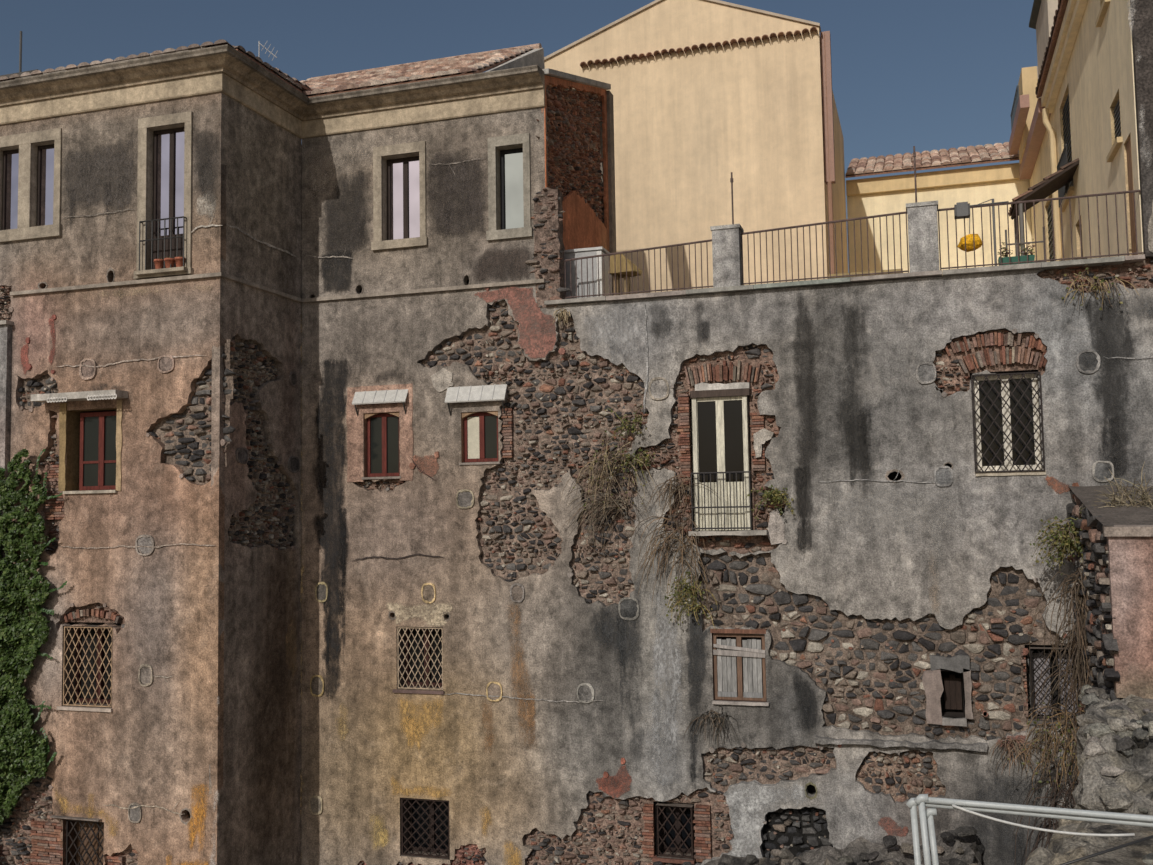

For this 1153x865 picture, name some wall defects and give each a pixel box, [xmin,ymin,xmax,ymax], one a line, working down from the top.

damp [309,150,368,291]
flaking render [0,285,14,321]
flaking render [1037,254,1153,293]
flaking render [146,336,296,551]
flaking render [356,452,439,491]
damp [314,360,351,698]
crack [353,553,444,565]
flaking render [420,273,1120,802]
flaking render [0,776,70,865]
flaking render [107,846,138,865]
flaking render [443,844,489,865]
flaking render [524,742,842,865]